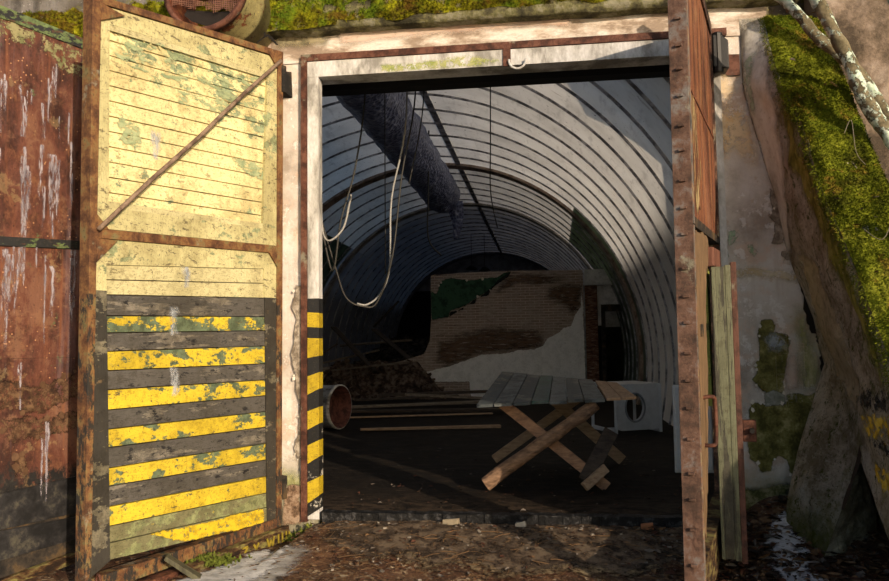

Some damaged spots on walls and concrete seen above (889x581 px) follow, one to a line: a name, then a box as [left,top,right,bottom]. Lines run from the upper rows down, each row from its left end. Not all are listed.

peeling [115,40,264,114]
water stain [2,88,73,303]
peeling [117,114,142,148]
peeling [232,158,263,181]
flaking render [740,27,790,260]
water stain [36,255,54,315]
peeling [431,272,511,320]
flaking render [427,295,585,397]
peeling [747,319,815,476]
peeling [841,389,889,510]